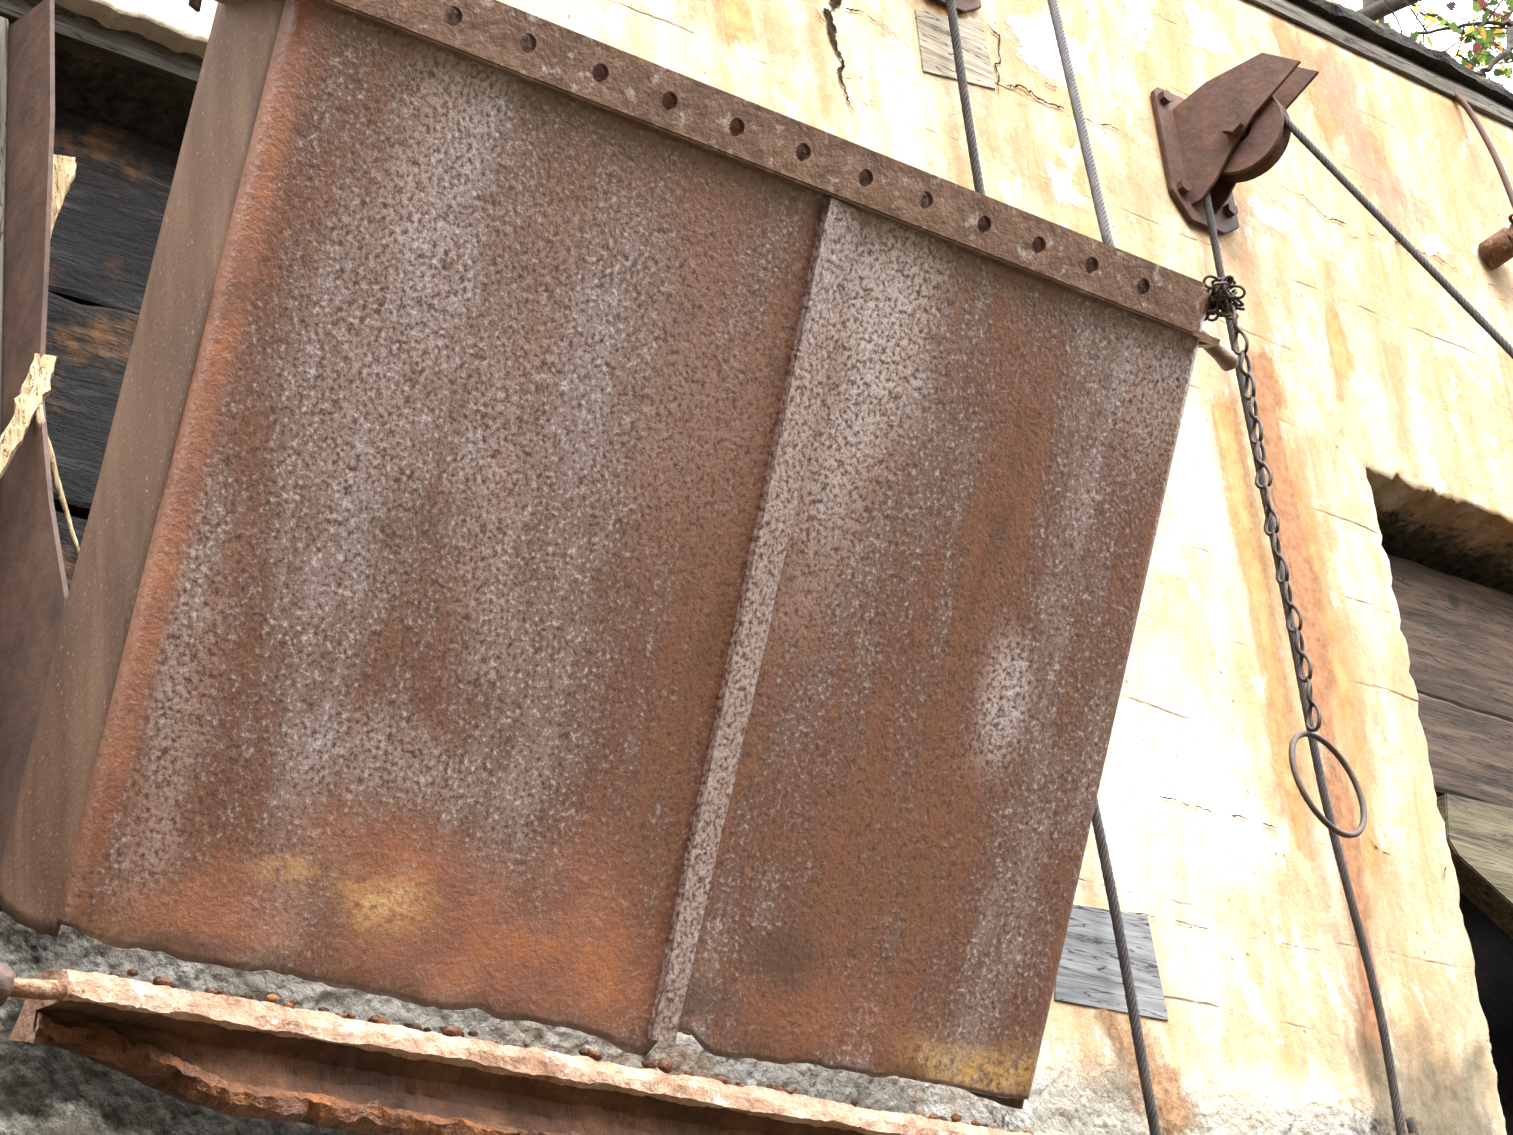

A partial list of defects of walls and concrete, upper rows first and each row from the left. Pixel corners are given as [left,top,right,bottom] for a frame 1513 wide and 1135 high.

rust [1213,398,1313,855]
rust [1247,349,1384,1073]